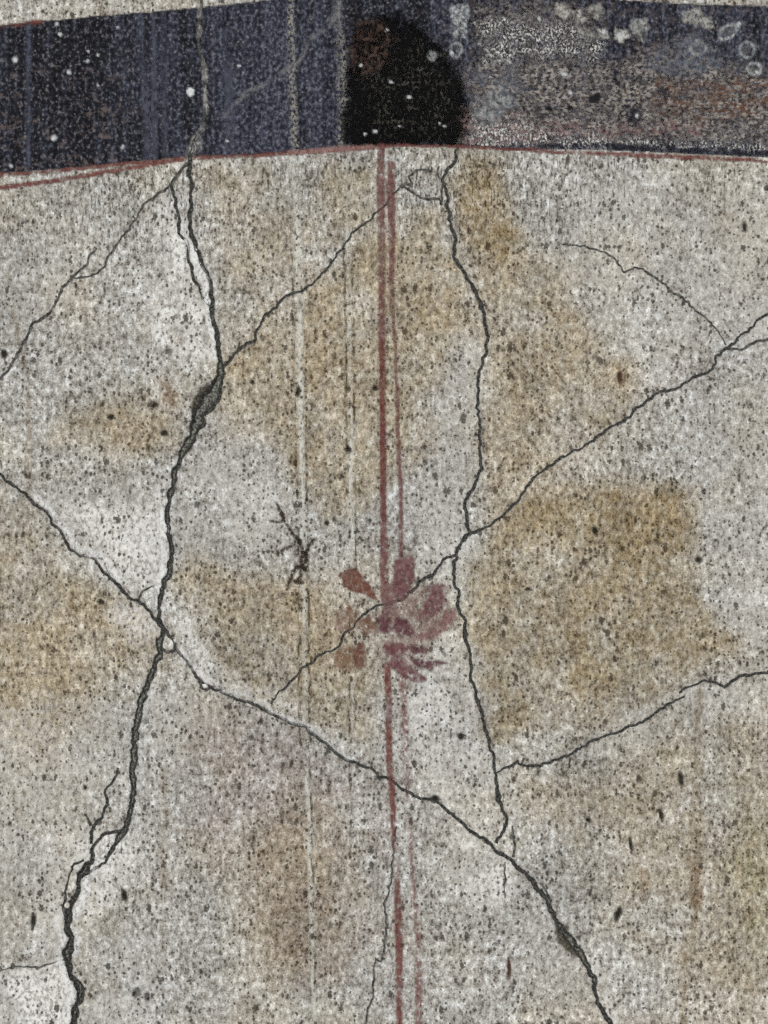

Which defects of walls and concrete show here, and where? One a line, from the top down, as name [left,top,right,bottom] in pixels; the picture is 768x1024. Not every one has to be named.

water stain [296,310,306,503]
crack [0,0,613,1024]
crack [222,138,768,843]
water stain [184,626,213,668]
water stain [415,678,454,761]
water stain [305,768,316,1022]